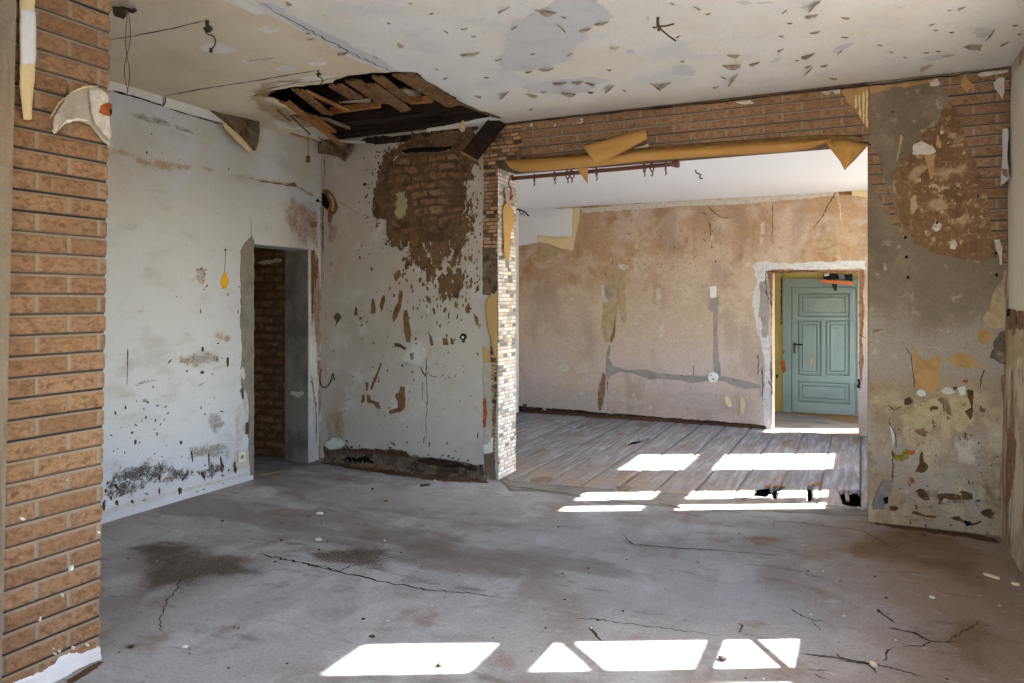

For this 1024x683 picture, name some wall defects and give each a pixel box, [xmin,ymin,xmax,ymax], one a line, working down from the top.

peeling [495,0,626,110]
peeling [891,101,997,262]
flaking render [308,248,485,477]
flaking render [334,126,482,425]
flaking render [765,269,865,381]
leakage [103,443,232,498]
flaking render [872,386,998,528]
crack [159,572,184,633]
leakage [118,538,269,600]
crack [256,553,515,599]
leakage [299,546,495,594]
crack [790,608,980,680]